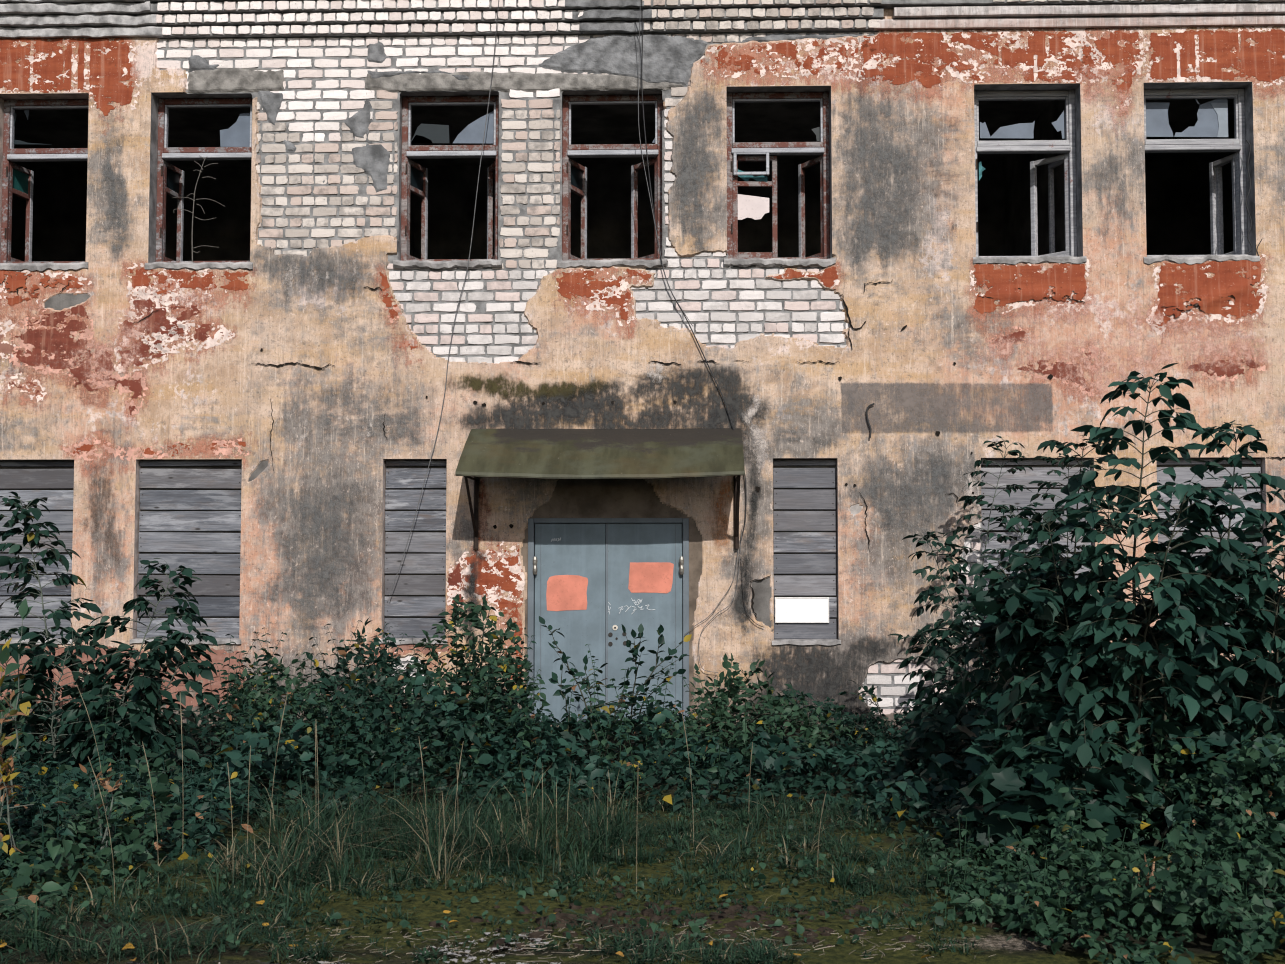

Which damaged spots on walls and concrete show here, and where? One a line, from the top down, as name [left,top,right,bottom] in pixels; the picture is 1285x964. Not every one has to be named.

peeling [0,37,143,116]
flaking render [155,0,1285,364]
water stain [845,98,917,266]
peeling [0,262,255,422]
water stain [462,363,768,630]
water stain [462,550,484,647]
flaking render [446,479,703,716]
flaking render [858,659,955,715]